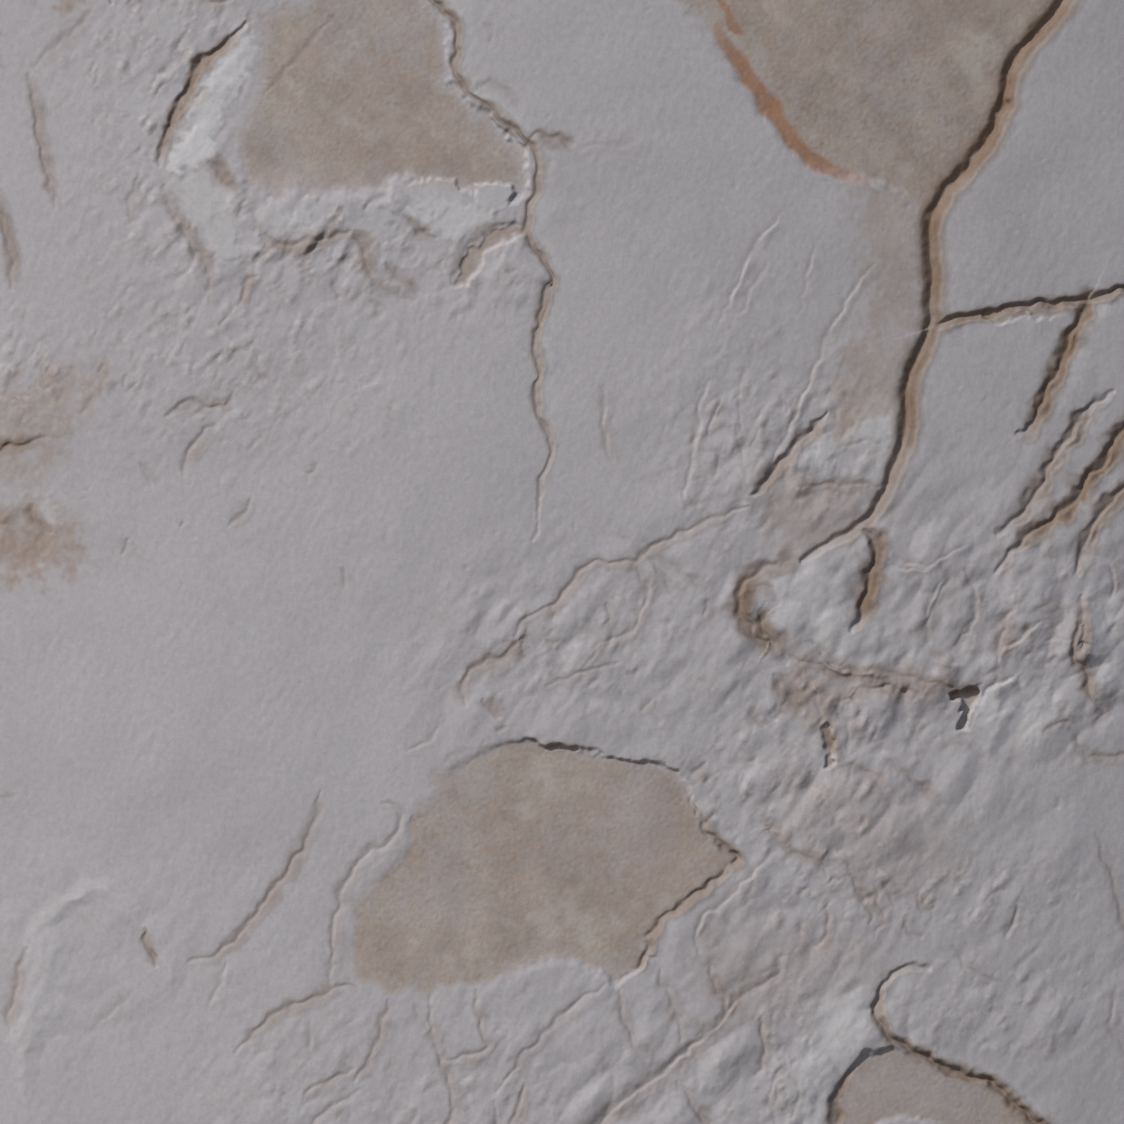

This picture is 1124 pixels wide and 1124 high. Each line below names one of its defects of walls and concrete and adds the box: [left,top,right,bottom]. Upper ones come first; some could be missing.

leakage [0,341,133,603]
crack [165,391,236,479]
crack [156,0,249,284]
crack [259,229,420,296]
spalling [169,0,533,291]
crack [402,214,438,240]
crack [429,0,577,542]
crack [456,0,1124,721]
spalling [649,0,1055,228]
spalling [339,736,747,1002]
crack [523,738,593,755]
spalling [841,1044,1026,1124]